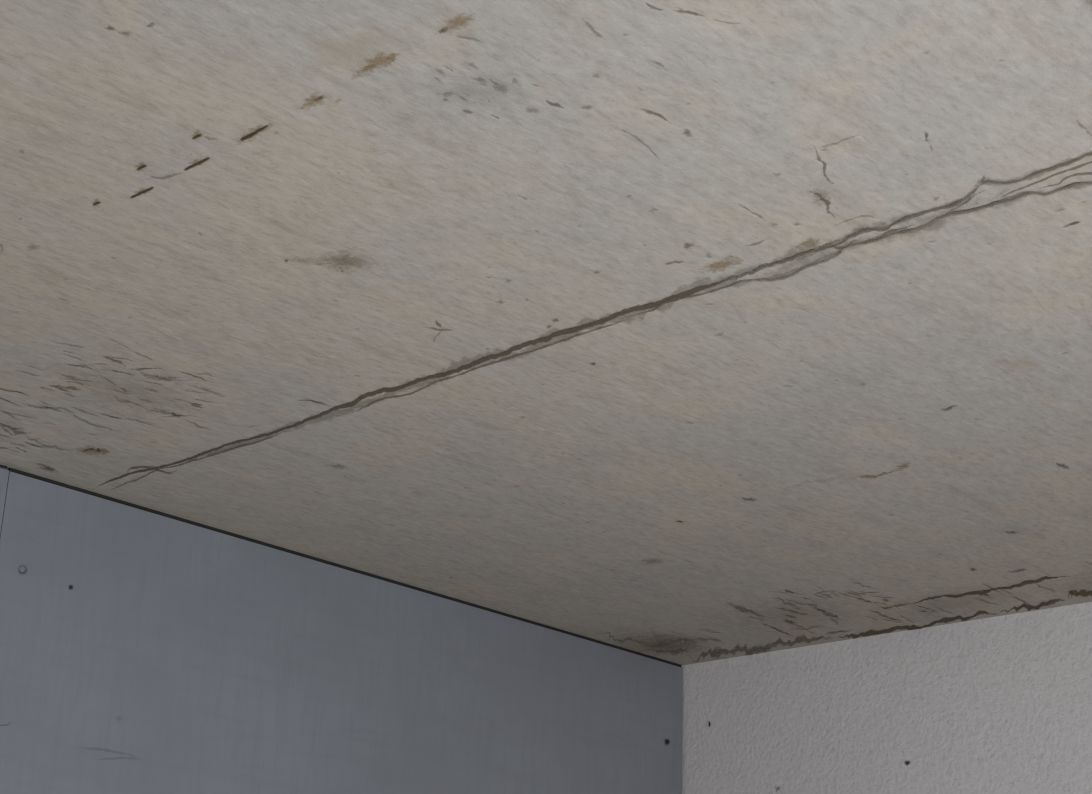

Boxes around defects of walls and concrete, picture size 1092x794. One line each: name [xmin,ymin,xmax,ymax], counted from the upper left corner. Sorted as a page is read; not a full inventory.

crack [99,152,1092,489]
crack [885,569,1065,609]